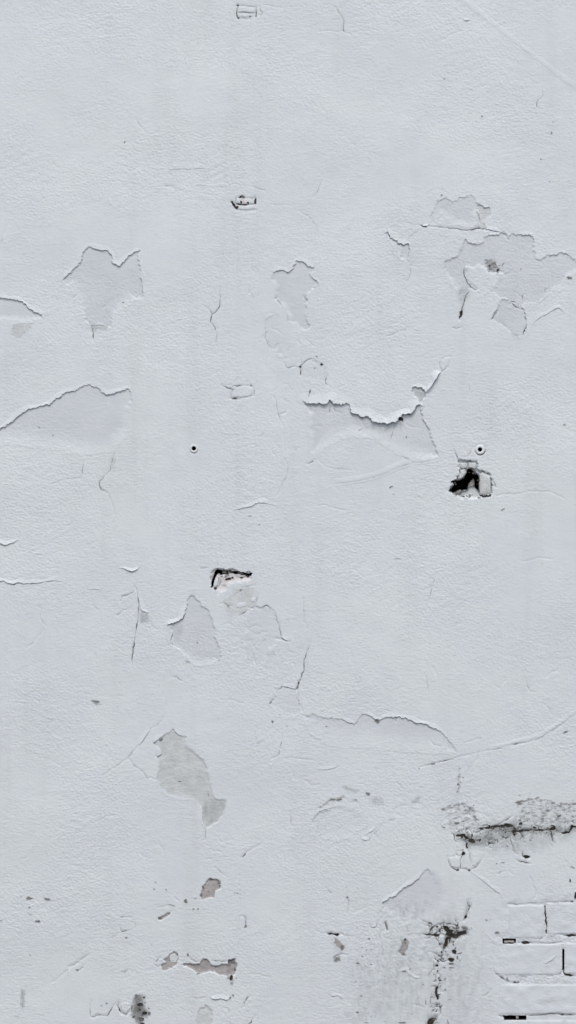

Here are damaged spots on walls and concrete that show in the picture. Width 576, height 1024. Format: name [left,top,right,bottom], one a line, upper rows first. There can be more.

peeling [0,294,44,337]
peeling [61,243,147,337]
peeling [272,257,320,334]
peeling [444,203,576,340]
peeling [0,381,132,456]
peeling [297,370,441,459]
spalling [449,453,493,499]
spalling [211,569,252,588]
peeling [163,595,221,668]
peeling [302,712,457,755]
flaking render [138,728,226,833]
spalling [157,952,237,980]